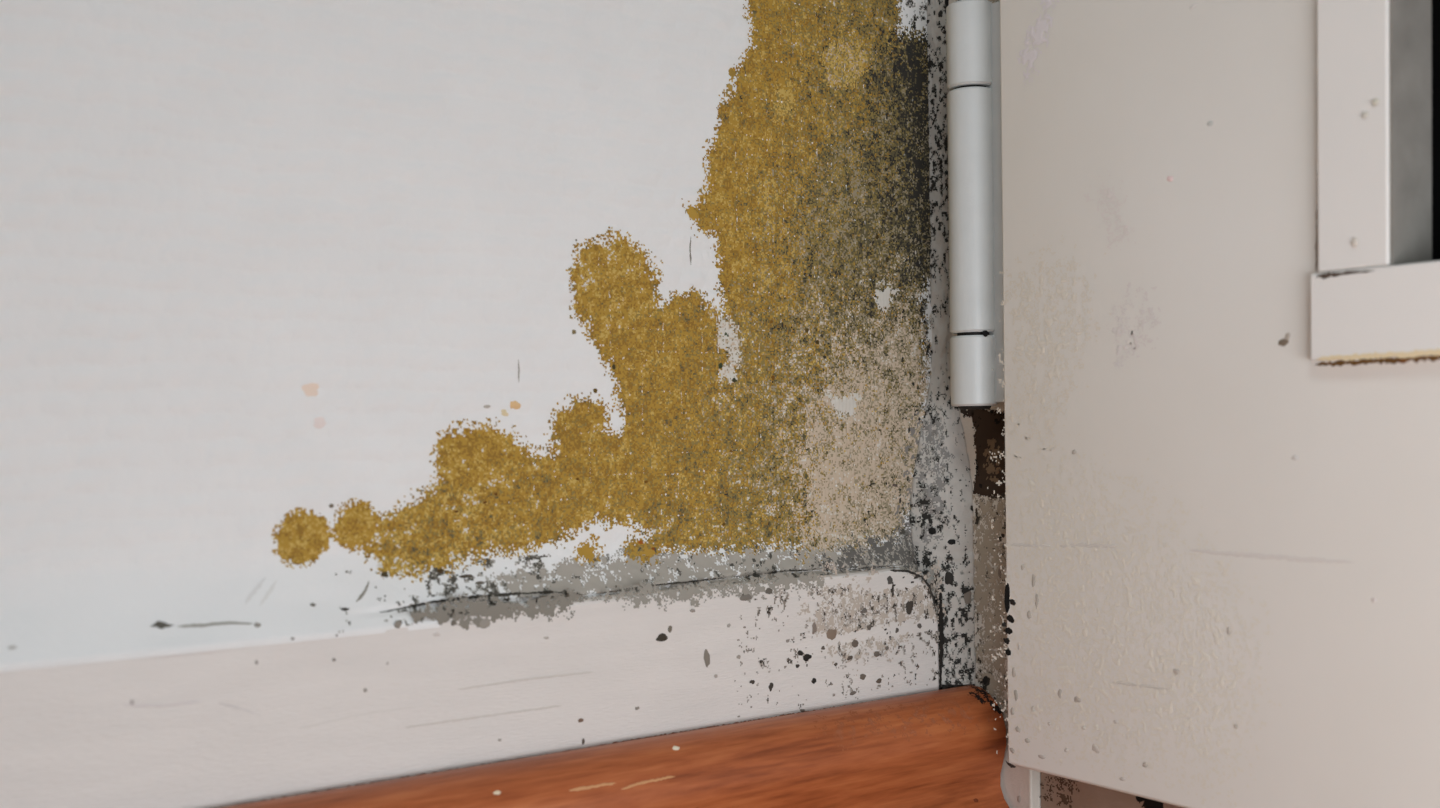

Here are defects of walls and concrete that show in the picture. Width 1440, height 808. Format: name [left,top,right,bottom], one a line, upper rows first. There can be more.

water stain [271,0,1281,808]